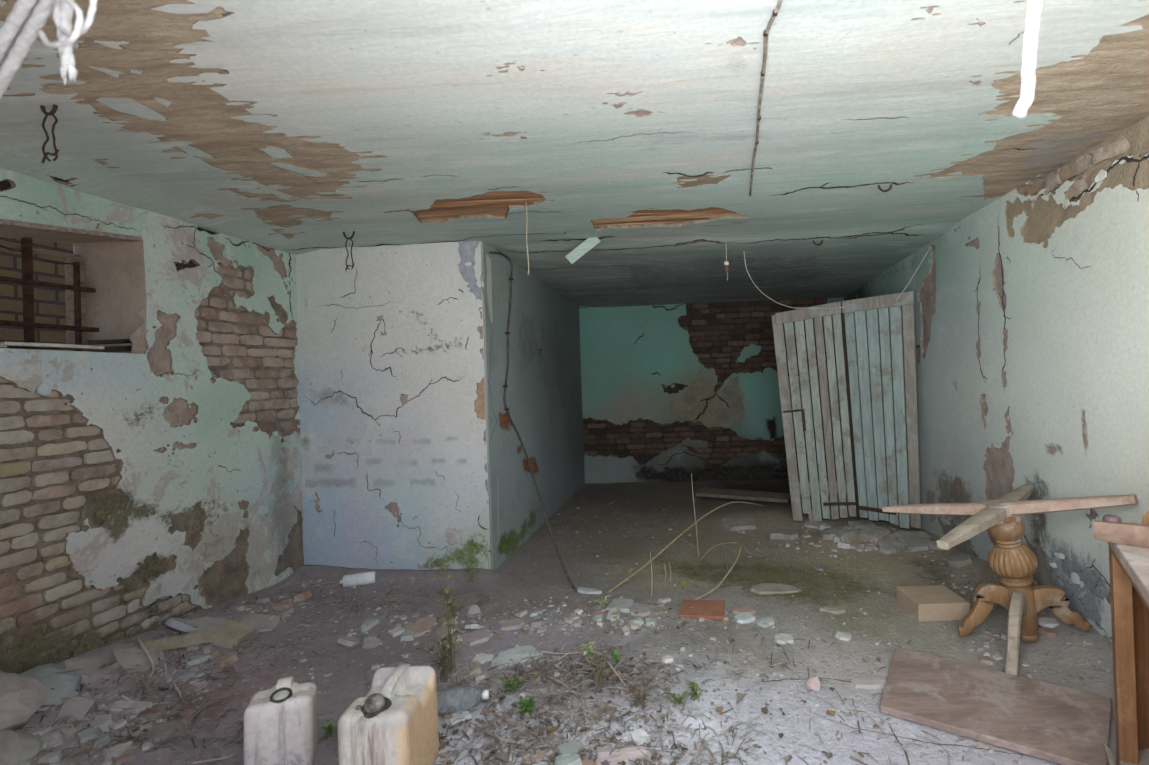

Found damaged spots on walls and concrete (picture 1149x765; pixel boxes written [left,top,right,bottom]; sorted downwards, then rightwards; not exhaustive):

peeling [3,0,380,238]
crack [421,186,920,253]
crack [663,167,915,196]
peeling [918,14,1149,248]
crack [1069,154,1149,203]
spalling [0,377,249,673]
spalling [130,213,302,436]
crack [0,196,497,530]
crack [338,452,458,552]
spalling [583,298,844,470]
spalling [984,411,1015,500]
leakage [1027,477,1100,623]